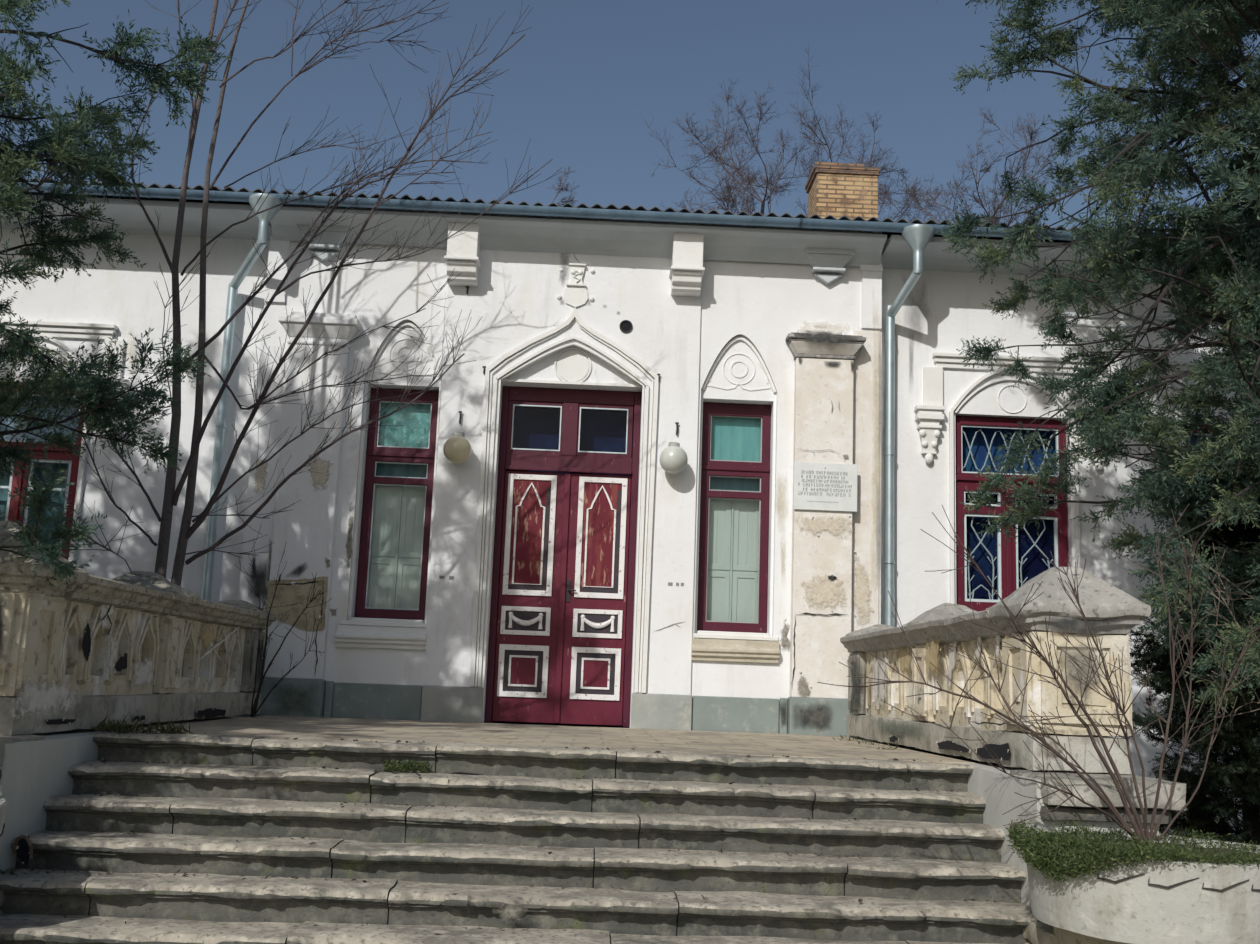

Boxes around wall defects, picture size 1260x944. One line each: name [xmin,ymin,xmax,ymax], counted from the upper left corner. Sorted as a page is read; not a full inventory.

flaking render [345,501,353,567]
flaking render [266,558,336,631]
peeling [802,574,846,611]
peeling [100,605,153,688]
spalling [936,740,1010,761]